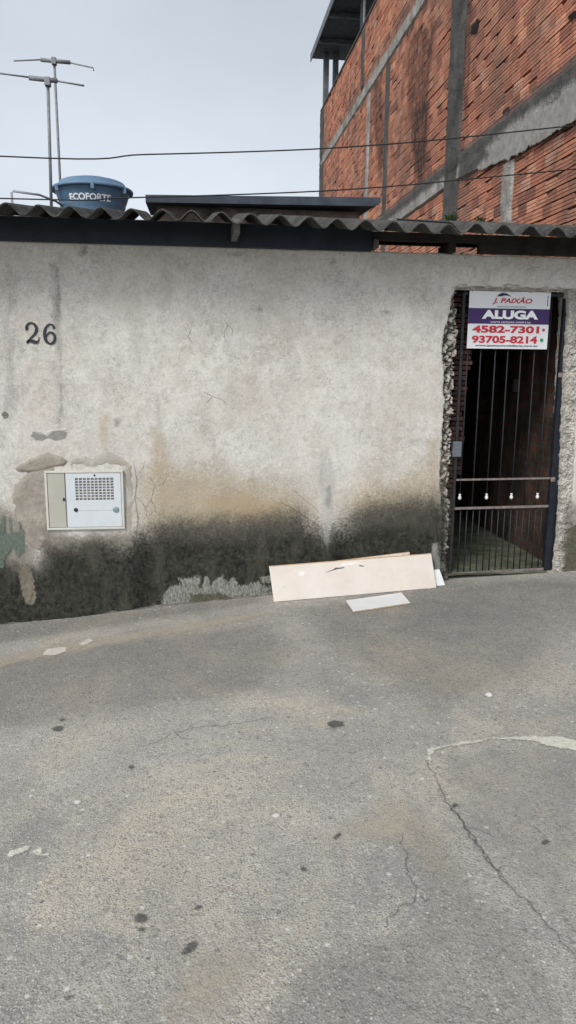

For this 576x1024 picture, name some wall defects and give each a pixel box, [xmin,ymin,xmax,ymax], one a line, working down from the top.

peeling [0,515,36,605]
peeling [163,574,273,604]
leakage [0,476,447,624]